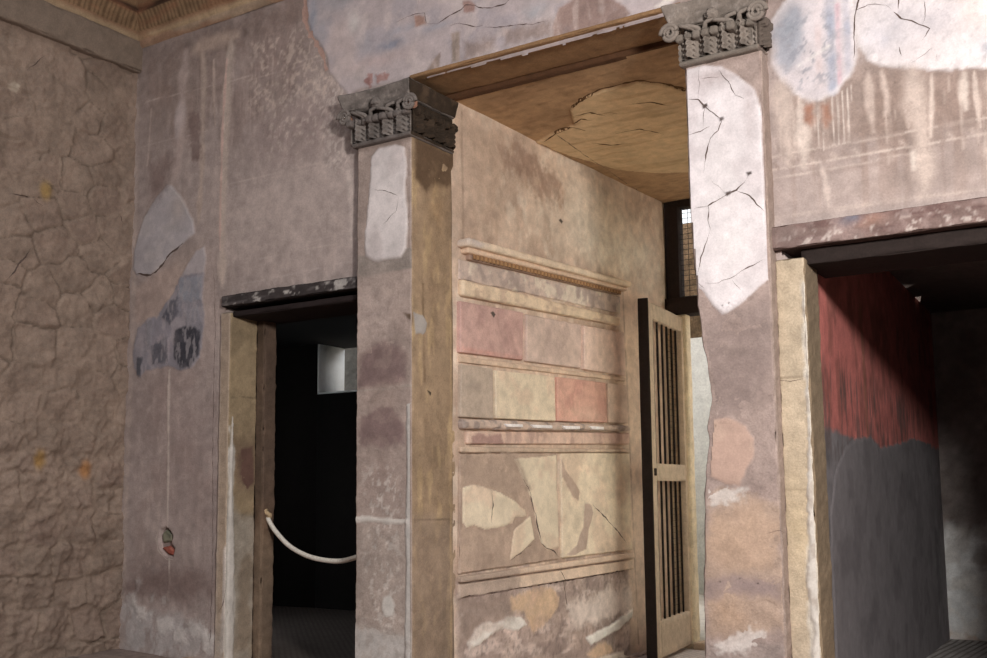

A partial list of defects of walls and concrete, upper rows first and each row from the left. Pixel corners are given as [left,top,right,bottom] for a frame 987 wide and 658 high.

crack [395,0,544,28]
crack [853,0,937,63]
crack [690,66,742,166]
leakage [769,58,946,210]
leakage [954,63,987,195]
crack [697,180,762,289]
crack [467,480,630,604]